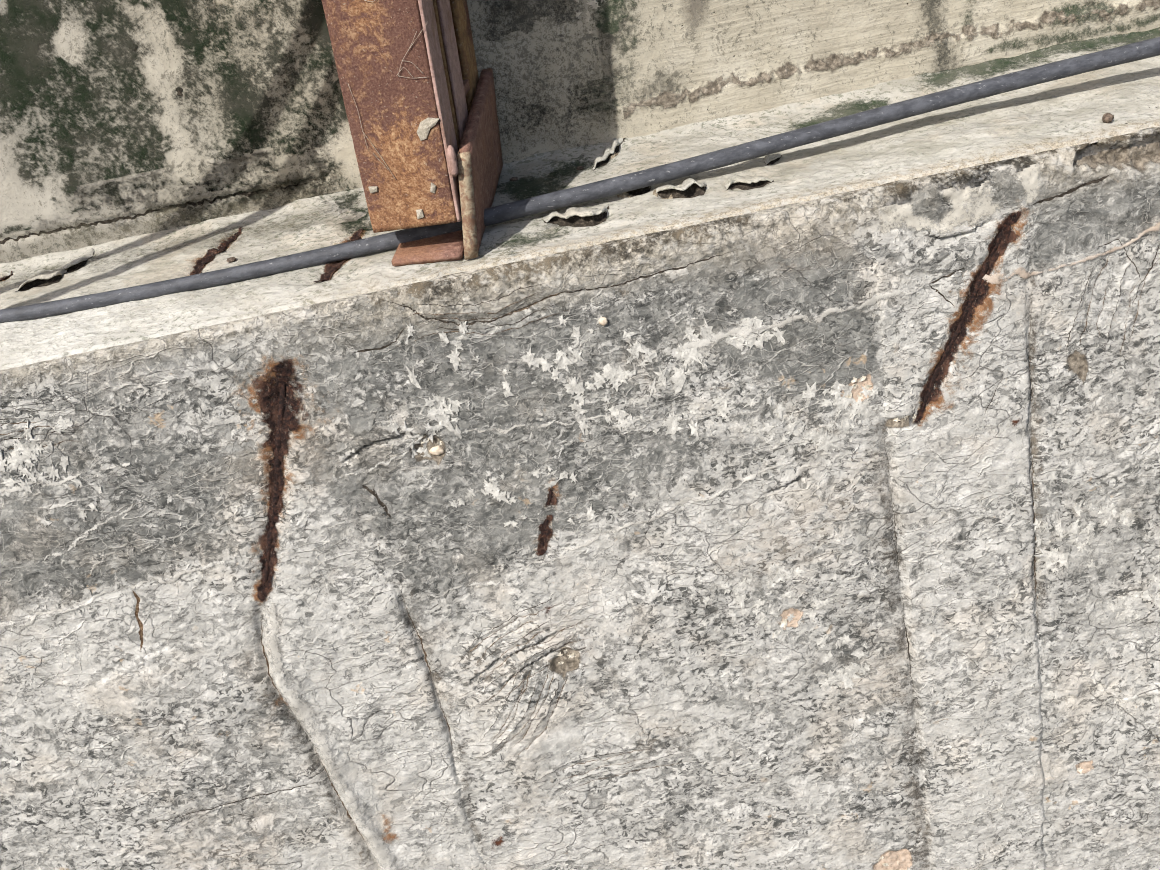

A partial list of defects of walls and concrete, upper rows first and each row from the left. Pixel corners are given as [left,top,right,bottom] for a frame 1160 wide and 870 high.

peeling [724,152,782,190]
peeling [543,177,707,227]
peeling [15,248,94,292]
crack [354,247,742,353]
spalling [880,156,1041,428]
peeling [502,369,515,398]
peeling [521,314,786,434]
peeling [653,374,878,452]
peeling [449,473,517,508]
peeling [529,466,578,490]
rust [535,483,560,556]
peeling [567,504,603,531]